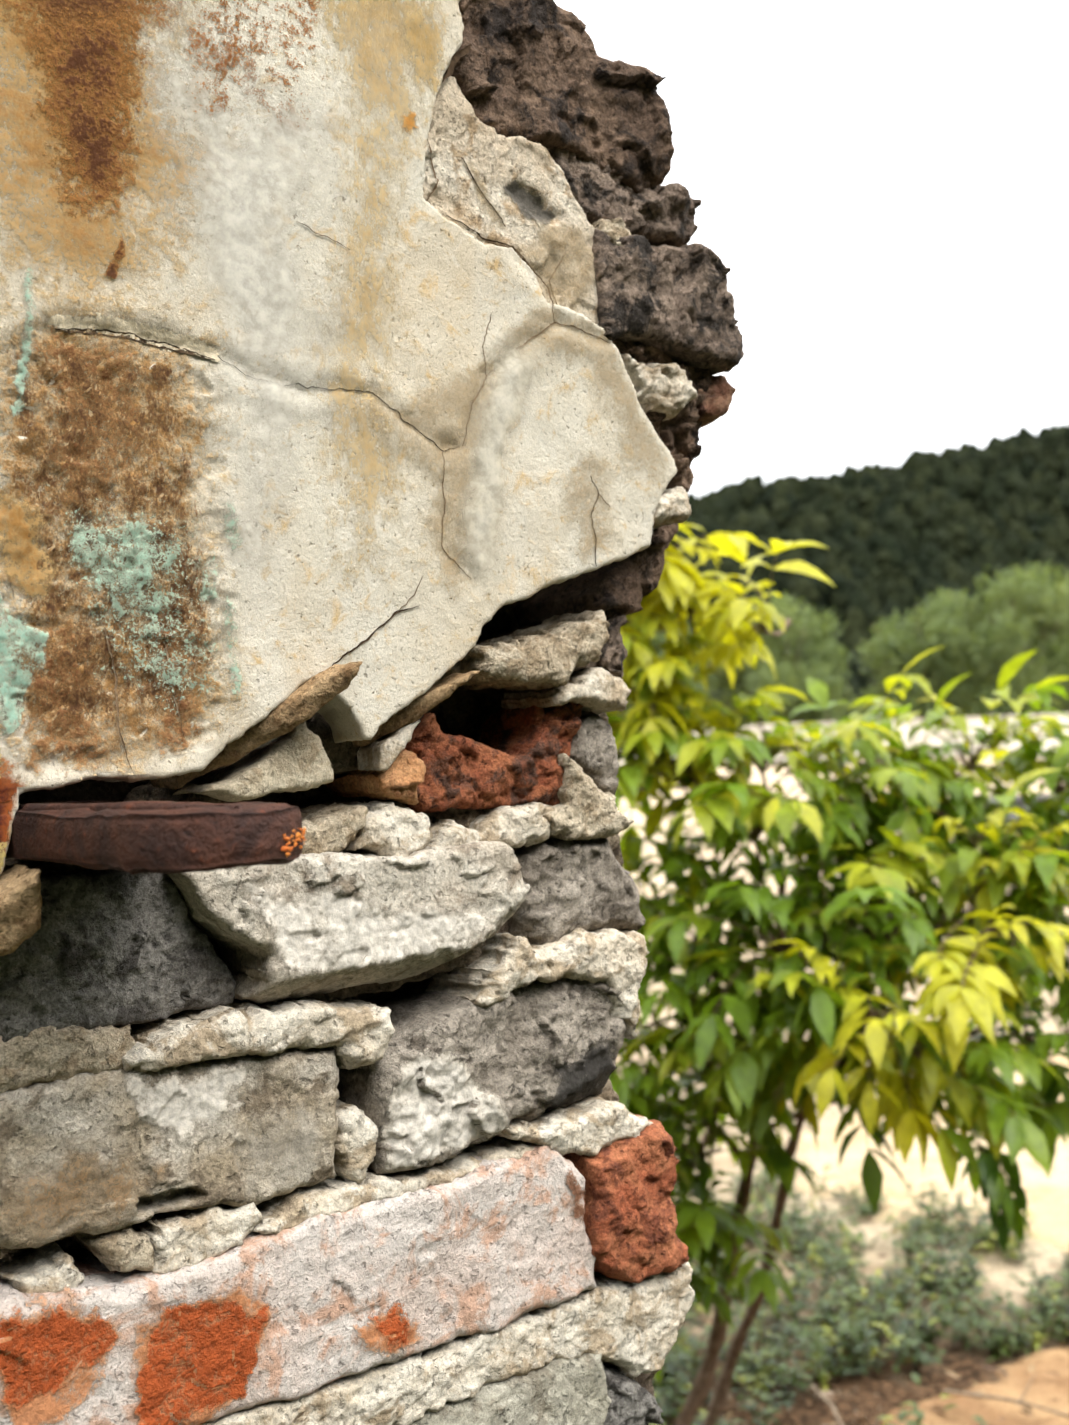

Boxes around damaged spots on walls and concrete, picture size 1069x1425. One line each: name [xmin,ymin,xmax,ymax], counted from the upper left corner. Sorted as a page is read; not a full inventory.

corrosion [0,0,332,346]
crack [296,221,350,250]
crack [218,241,610,666]
corrosion [0,756,23,854]
corrosion [281,827,306,857]